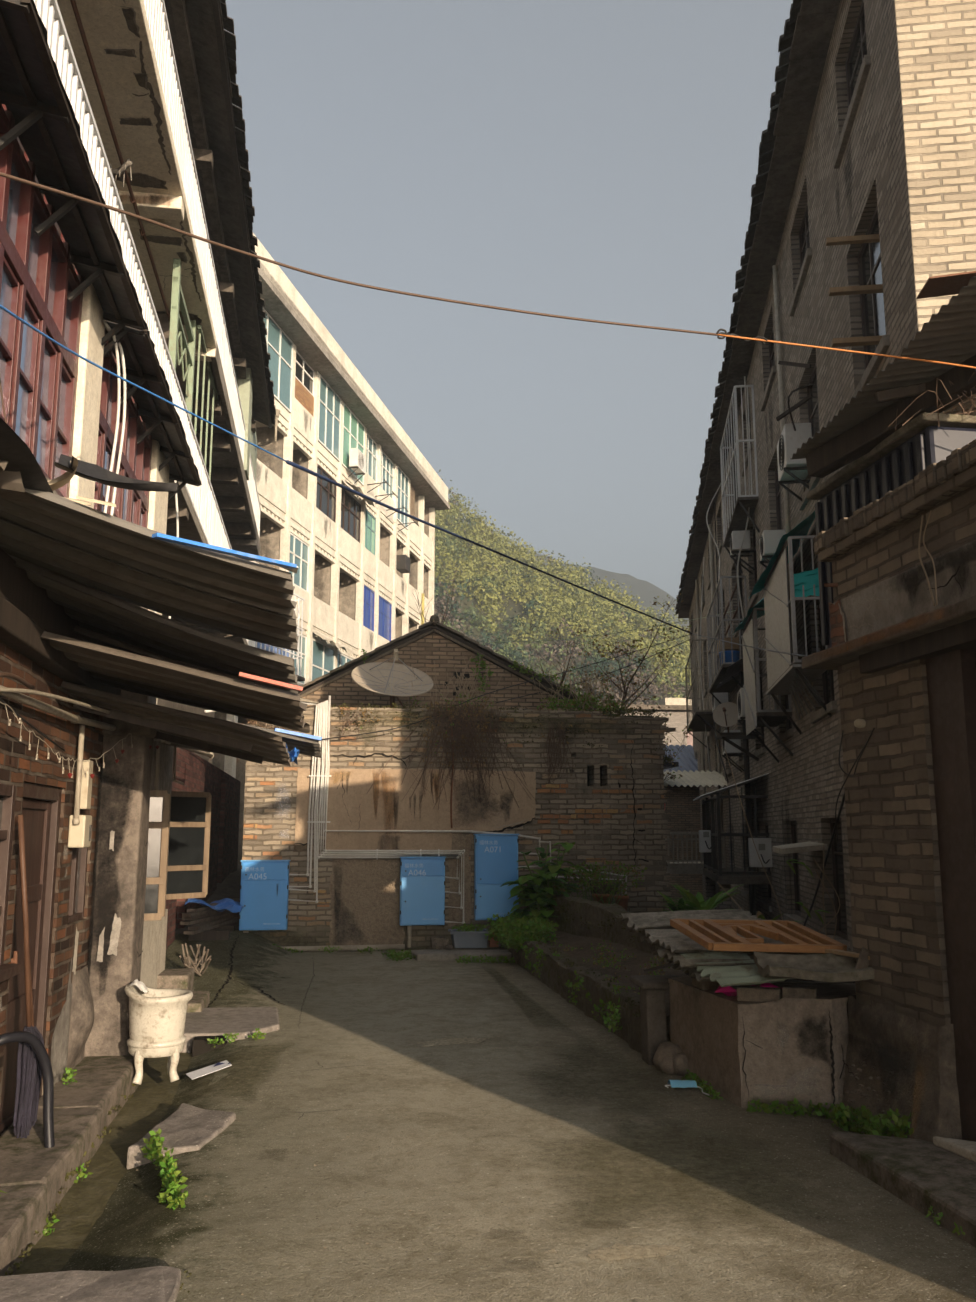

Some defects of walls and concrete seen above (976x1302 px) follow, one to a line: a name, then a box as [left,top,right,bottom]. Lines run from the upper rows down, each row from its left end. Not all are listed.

spalling [104,0,172,190]
crack [829,1011,855,1106]